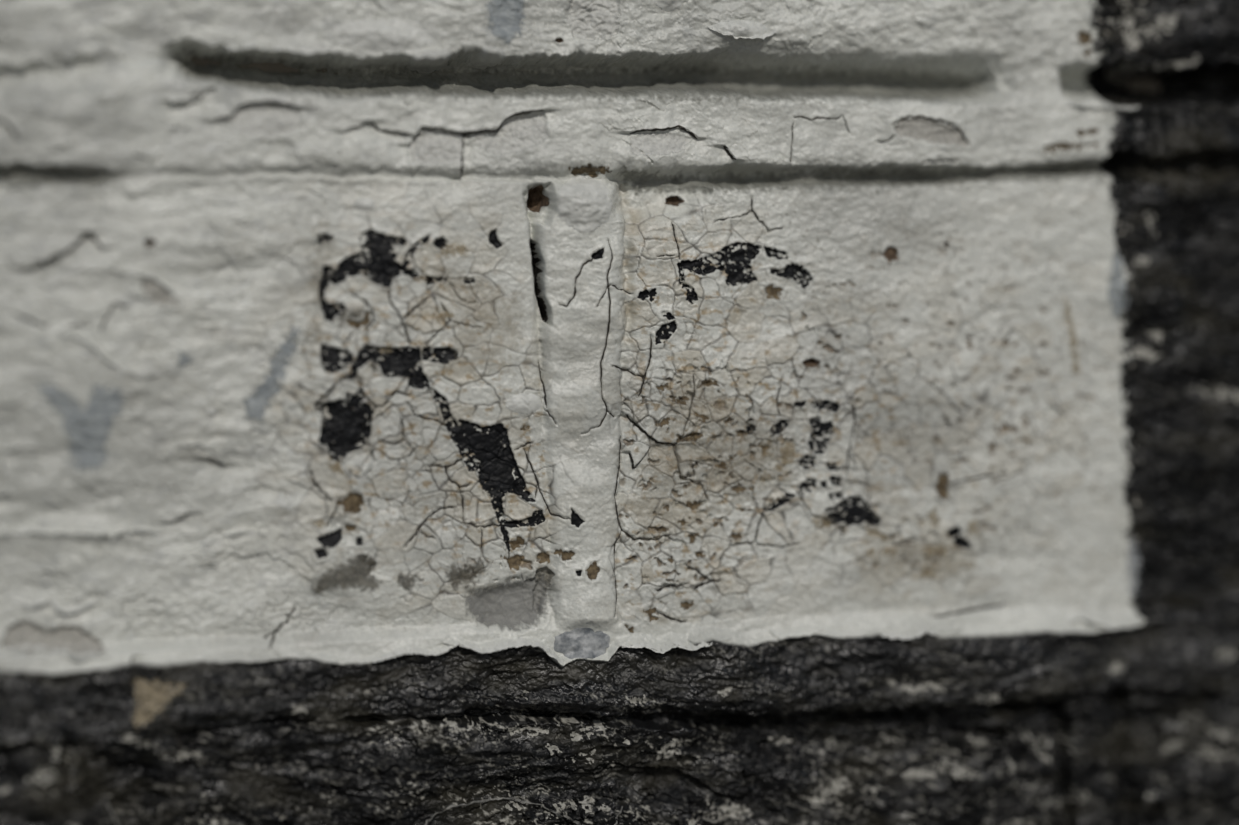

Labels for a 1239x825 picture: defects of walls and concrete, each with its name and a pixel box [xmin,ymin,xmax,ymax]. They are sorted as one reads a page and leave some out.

crack [345,110,544,176]
crack [790,116,849,165]
crack [877,116,969,163]
crack [657,222,680,259]
crack [715,198,783,232]
crack [343,285,481,345]
crack [748,375,784,418]
crack [515,240,709,613]
crack [317,377,509,555]
crack [309,470,339,526]
crack [733,509,797,548]
crack [656,564,721,623]